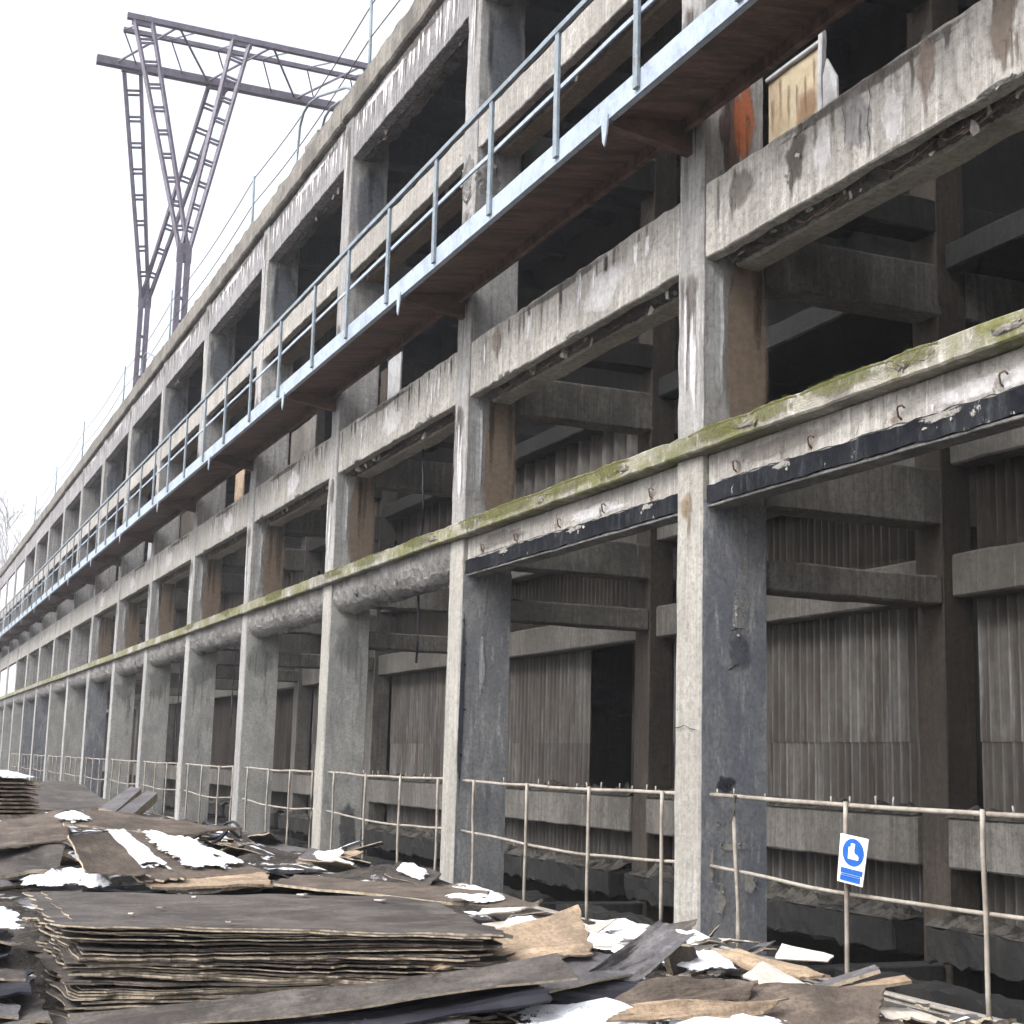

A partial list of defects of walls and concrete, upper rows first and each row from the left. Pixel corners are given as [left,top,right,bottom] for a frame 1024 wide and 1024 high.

rust [734,87,754,160]
spalling [727,73,1024,264]
water stain [80,0,457,501]
spalling [486,282,679,400]
water stain [680,276,696,393]
water stain [714,264,767,418]
water stain [738,431,819,469]
water stain [89,535,189,659]
water stain [188,557,221,619]
water stain [245,524,285,596]